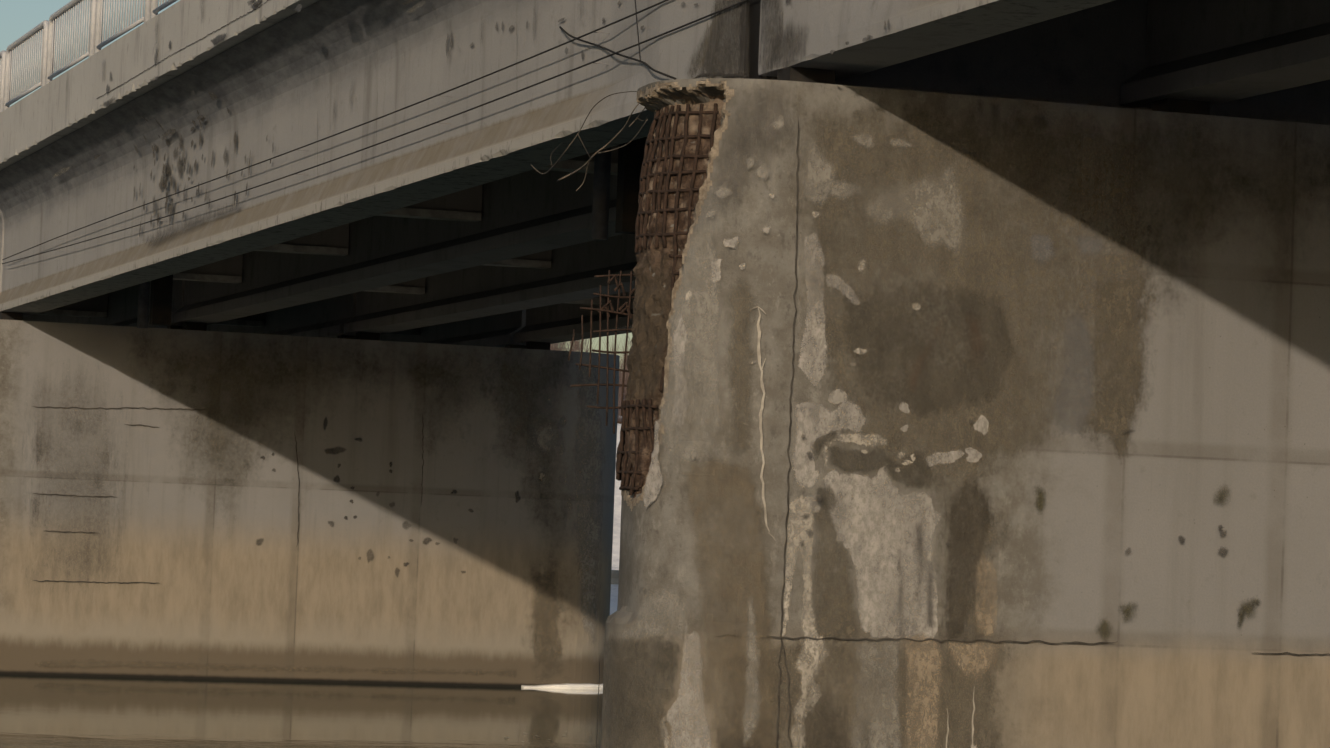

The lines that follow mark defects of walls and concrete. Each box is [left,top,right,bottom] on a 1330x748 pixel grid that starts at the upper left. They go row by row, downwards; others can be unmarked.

damp [689,0,802,78]
spalling [568,79,738,511]
peeling [793,389,982,748]
damp [498,101,1330,748]
crack [715,120,1115,748]
peeling [969,415,989,435]
crack [1258,650,1330,658]